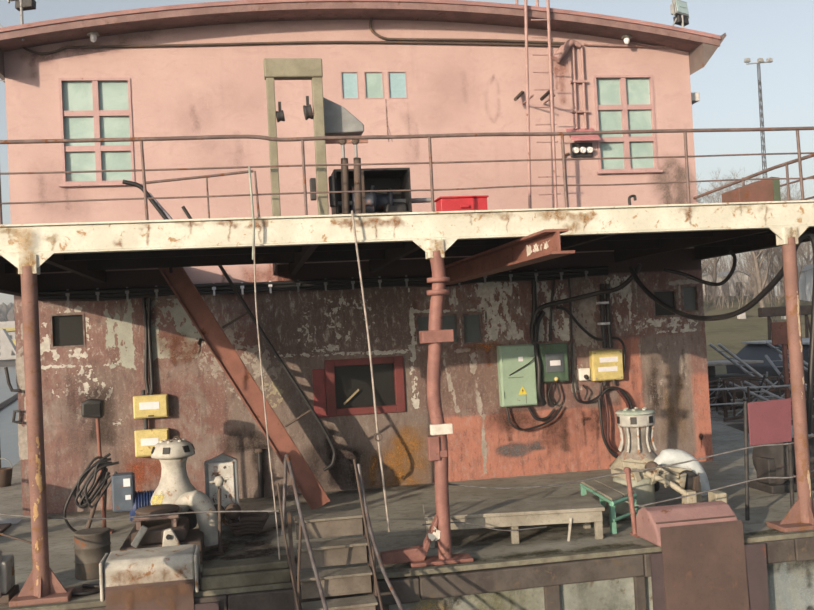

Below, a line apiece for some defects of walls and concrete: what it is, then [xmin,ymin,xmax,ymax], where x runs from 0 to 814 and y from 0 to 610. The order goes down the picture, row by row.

corrosion [343,217,401,237]
corrosion [544,210,593,230]
peeling [40,305,113,431]
peeling [103,299,136,370]
peeling [146,298,241,400]
peeling [224,295,429,409]
peeling [442,282,524,474]
peeling [531,275,699,393]
corrosion [369,429,424,487]
peeling [498,441,541,456]